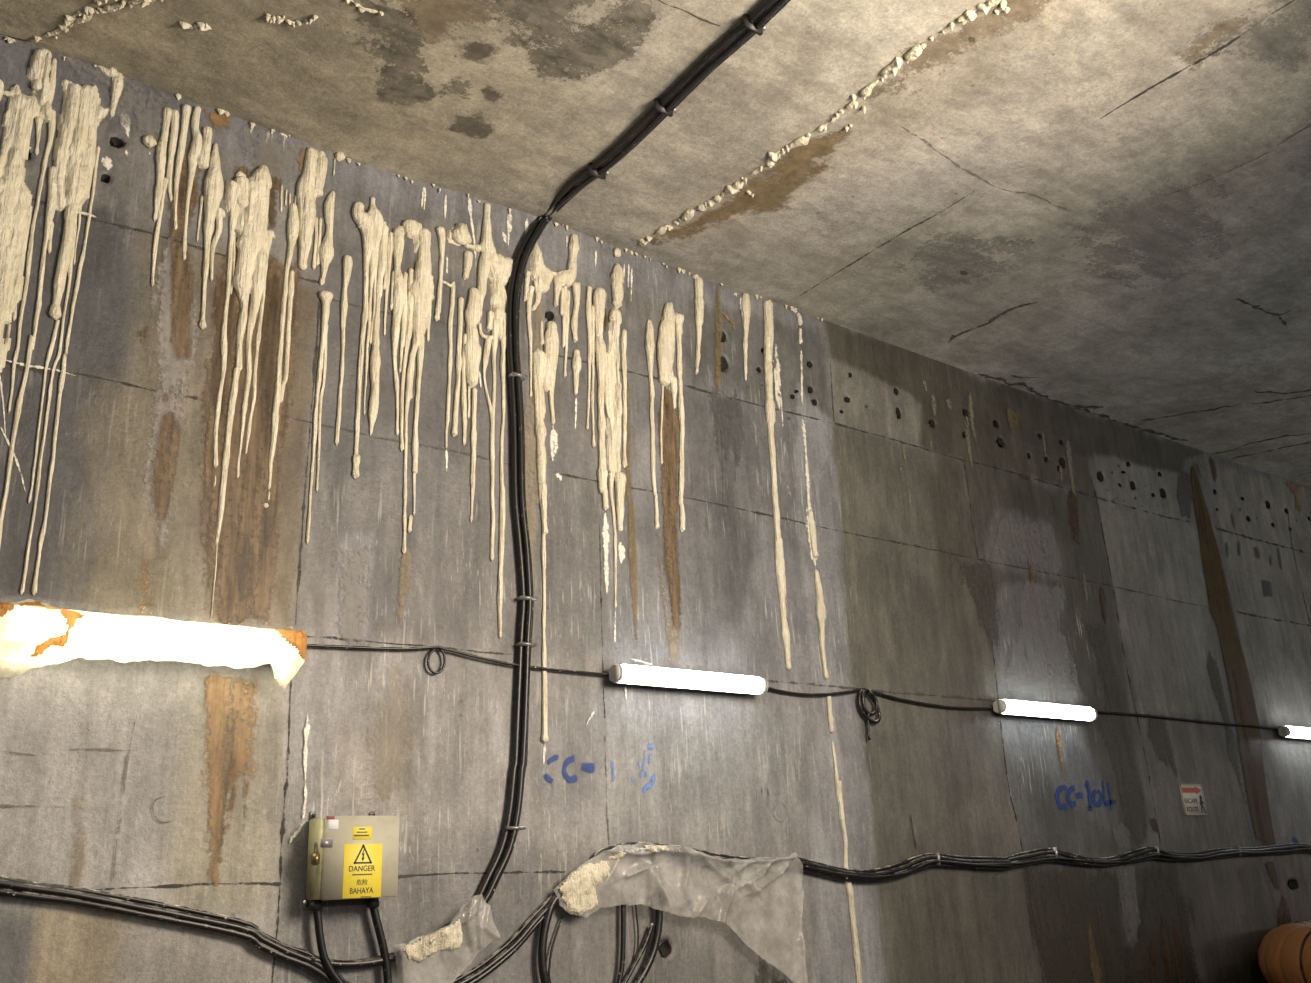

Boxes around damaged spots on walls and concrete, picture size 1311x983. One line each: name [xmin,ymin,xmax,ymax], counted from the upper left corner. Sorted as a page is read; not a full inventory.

rust [169,147,200,360]
rust [234,155,282,226]
water stain [897,232,1033,292]
water stain [1059,174,1236,288]
rust [151,394,180,520]
rust [199,249,301,625]
water stain [0,0,1011,764]
rust [659,386,681,629]
water stain [958,516,1080,703]
water stain [1177,455,1210,518]
rust [1191,457,1275,846]
rust [201,672,259,885]